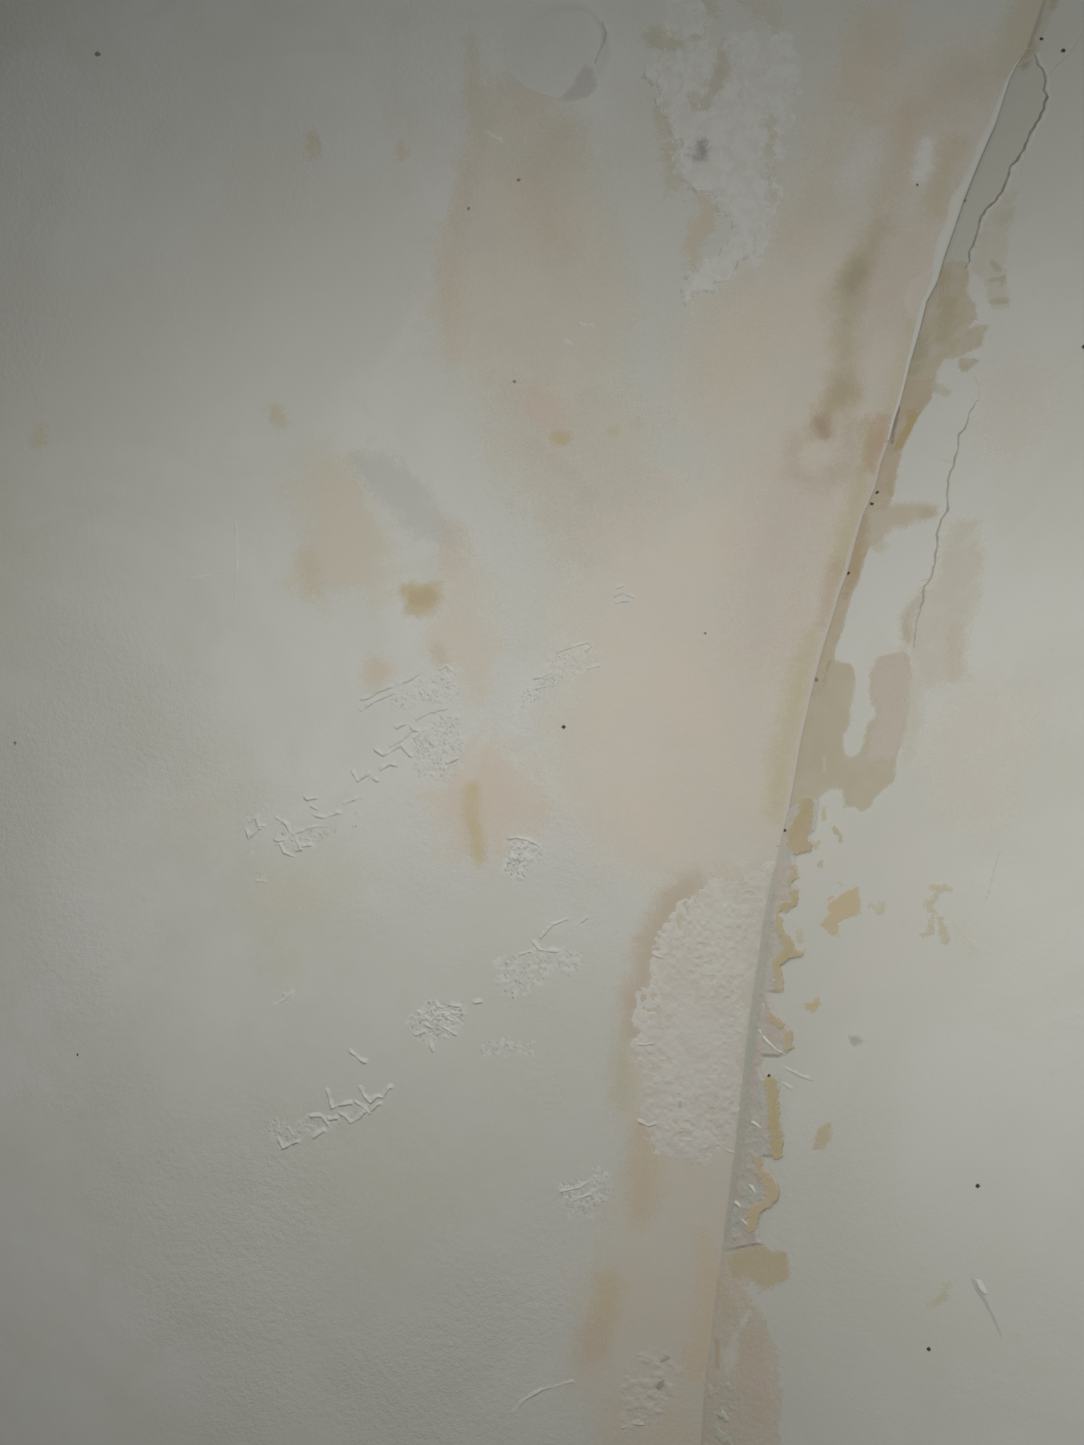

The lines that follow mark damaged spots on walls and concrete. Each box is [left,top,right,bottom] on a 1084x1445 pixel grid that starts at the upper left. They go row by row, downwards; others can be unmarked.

leakage [430,36,630,420]
leakage [290,455,500,697]
leakage [431,746,548,859]
leakage [551,10,1006,1445]
peeling [722,58,1021,1252]
crack [914,406,974,641]